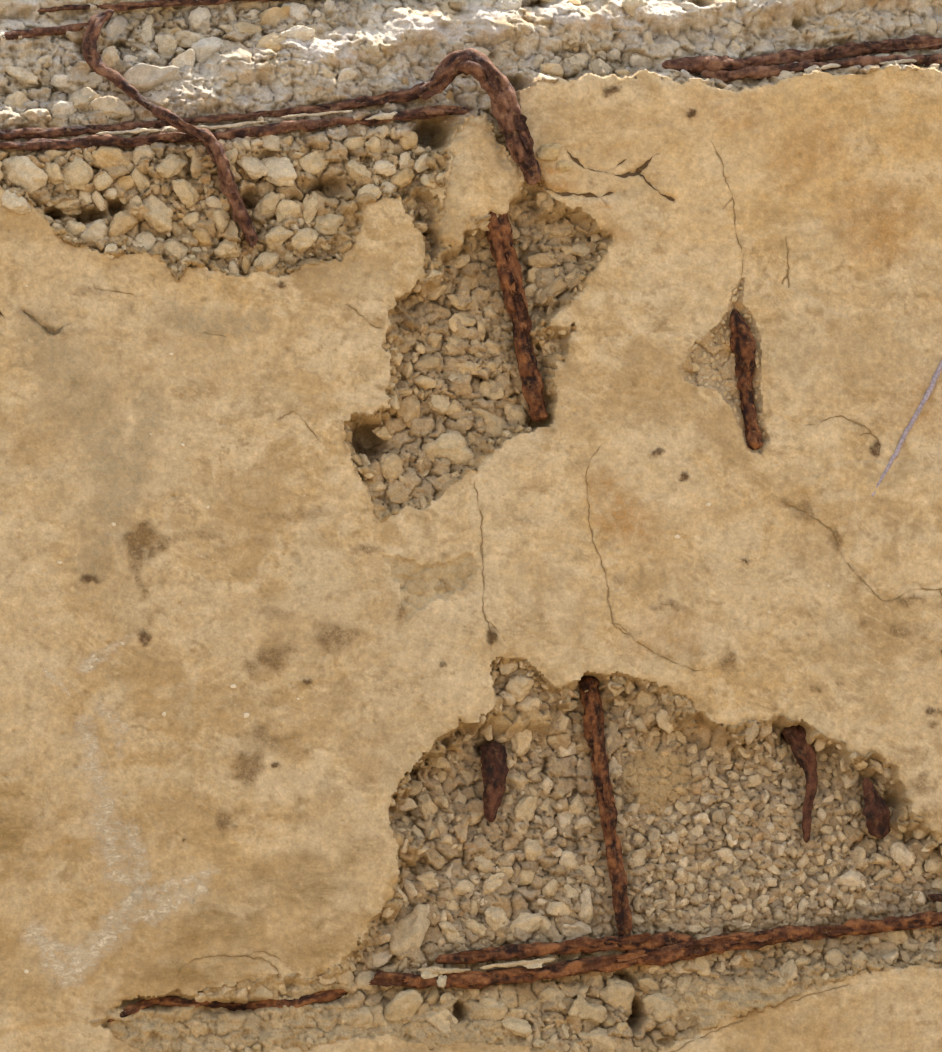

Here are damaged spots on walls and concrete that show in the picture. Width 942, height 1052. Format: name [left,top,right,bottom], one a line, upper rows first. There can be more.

spalling [0,0,942,523]
crack [806,415,881,458]
crack [474,483,497,648]
crack [585,447,709,671]
crack [789,505,942,601]
spalling [89,657,942,1052]